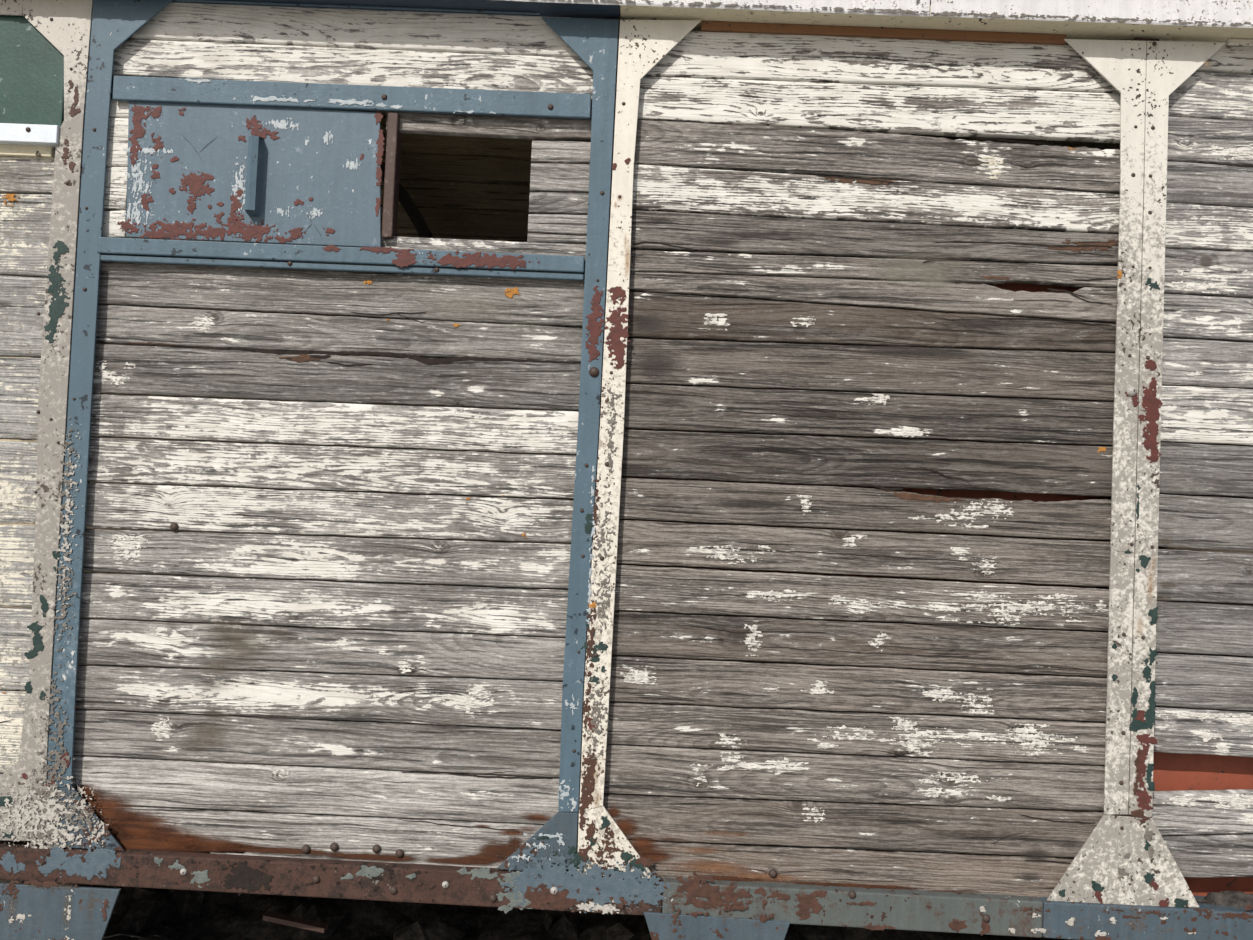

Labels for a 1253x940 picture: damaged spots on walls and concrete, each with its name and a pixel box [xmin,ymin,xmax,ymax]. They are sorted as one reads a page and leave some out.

peeling [116,95,415,252]
peeling [43,240,71,343]
crack [919,239,1118,326]
peeling [1125,360,1163,463]
crack [844,467,1109,503]
peeling [457,285,827,938]
peeling [0,417,121,940]
rust [75,785,548,865]
rust [608,808,675,863]
rust [696,849,913,890]
peeling [807,717,1086,802]
peeling [1091,646,1253,940]